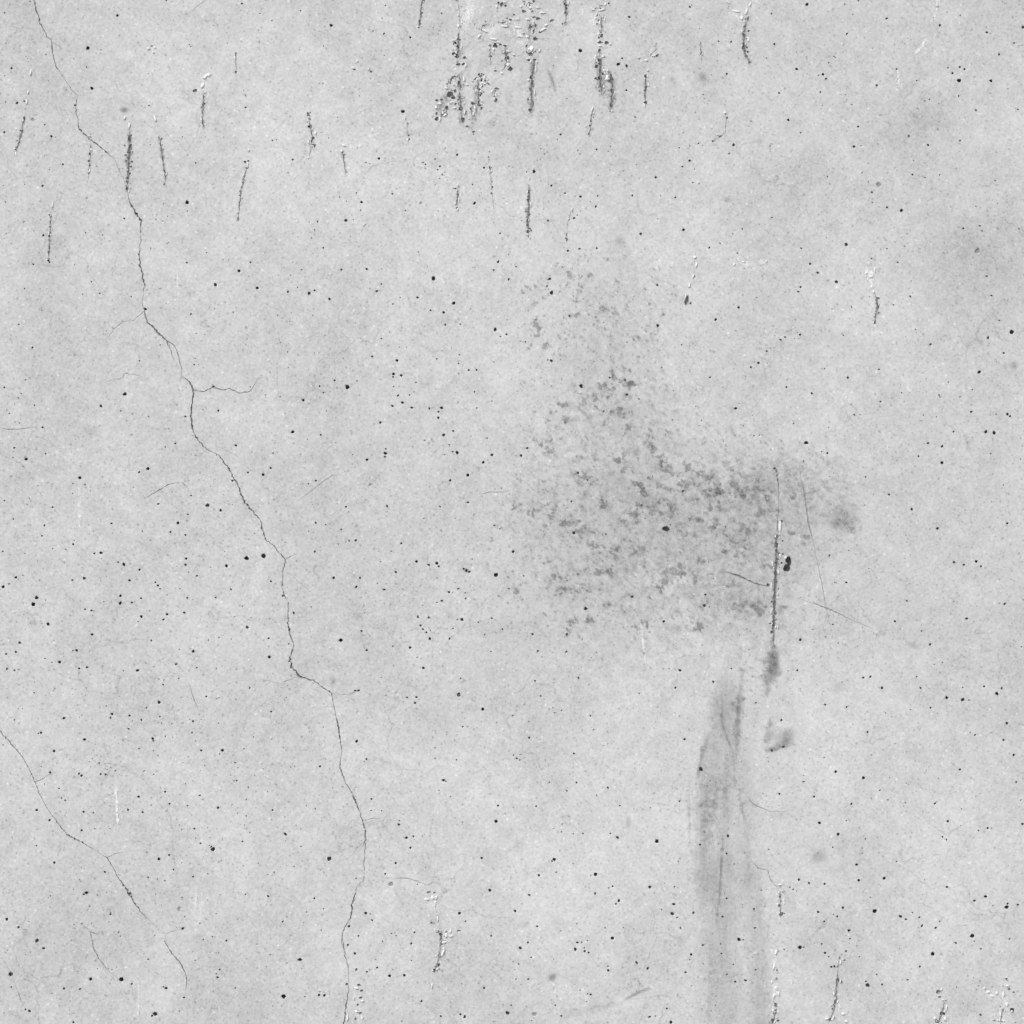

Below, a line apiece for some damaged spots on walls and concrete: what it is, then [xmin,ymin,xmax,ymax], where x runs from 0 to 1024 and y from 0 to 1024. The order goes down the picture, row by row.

spalling [435,0,569,133]
spalling [582,2,616,113]
crack [34,0,433,1024]
crack [0,730,187,988]